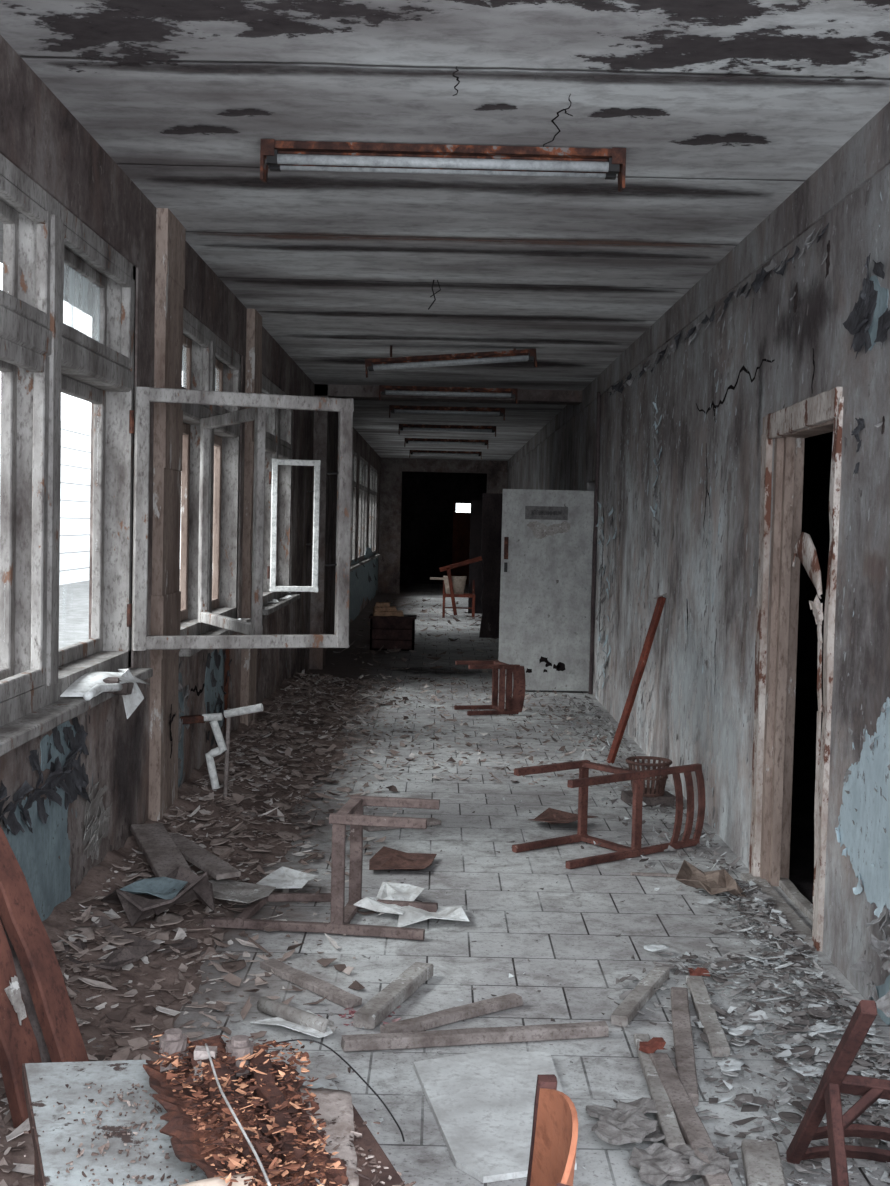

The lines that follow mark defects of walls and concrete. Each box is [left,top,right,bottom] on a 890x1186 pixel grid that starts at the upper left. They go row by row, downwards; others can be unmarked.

crack [543,94,572,147]
crack [696,359,775,422]
peeling [301,223,890,1186]
peeling [0,711,129,921]